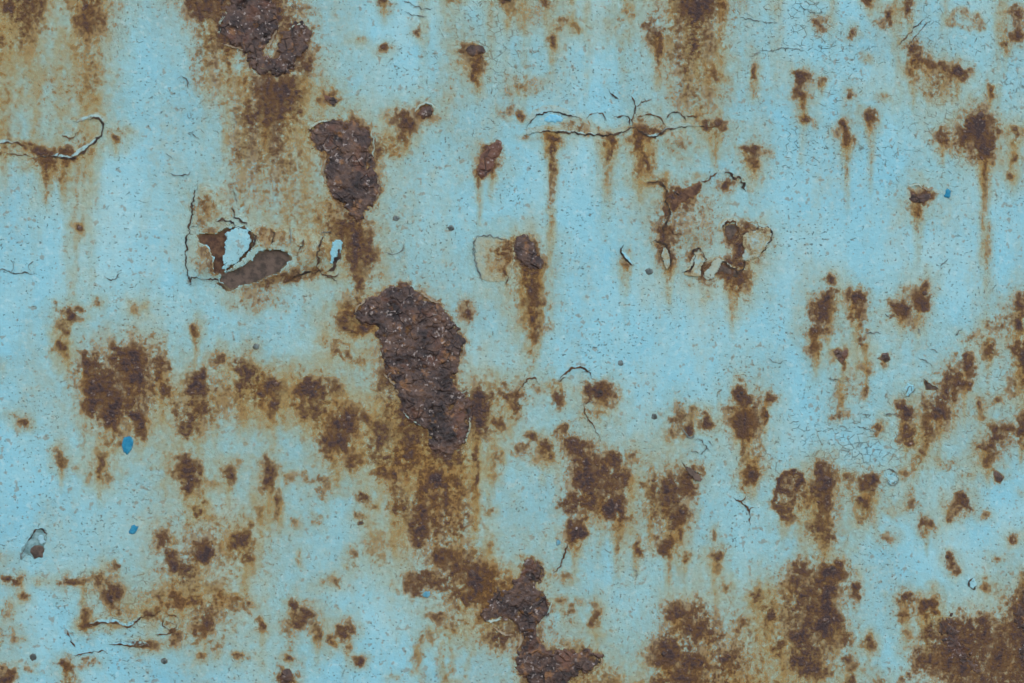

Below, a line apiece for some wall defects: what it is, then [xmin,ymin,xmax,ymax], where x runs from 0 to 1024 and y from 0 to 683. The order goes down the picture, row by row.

crack [0,111,108,160]
corrosion [0,0,130,208]
peeling [185,180,344,313]
peeling [472,234,516,283]
crack [524,91,716,138]
corrosion [483,0,776,367]
peeling [647,172,746,271]
peeling [684,217,773,280]
corrosion [791,68,827,127]
corrosion [861,0,1024,272]
corrosion [51,0,706,683]
corrosion [638,272,1024,683]